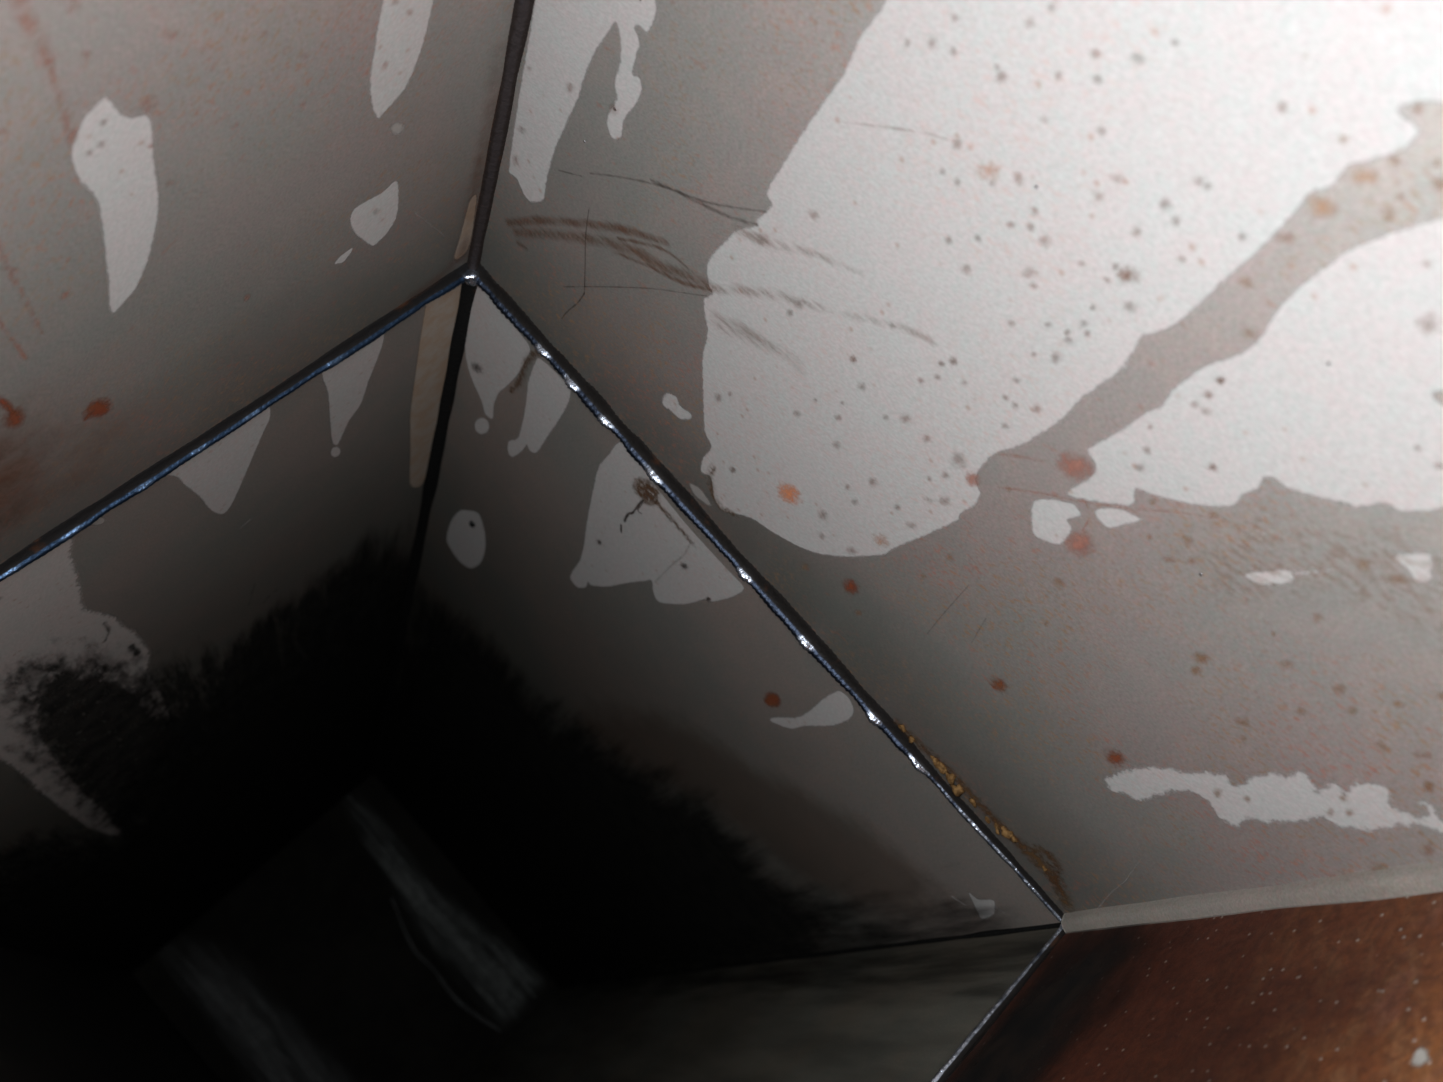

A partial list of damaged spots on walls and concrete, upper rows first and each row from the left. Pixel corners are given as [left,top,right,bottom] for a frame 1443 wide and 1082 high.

peeling [370,0,433,134]
peeling [509,0,656,202]
peeling [71,97,159,313]
peeling [335,181,399,264]
peeling [662,0,1443,557]
peeling [168,407,271,514]
peeling [322,335,384,457]
peeling [570,442,744,604]
peeling [0,538,170,836]
peeling [770,691,854,729]
rust [897,724,1072,906]
peeling [1104,766,1443,833]